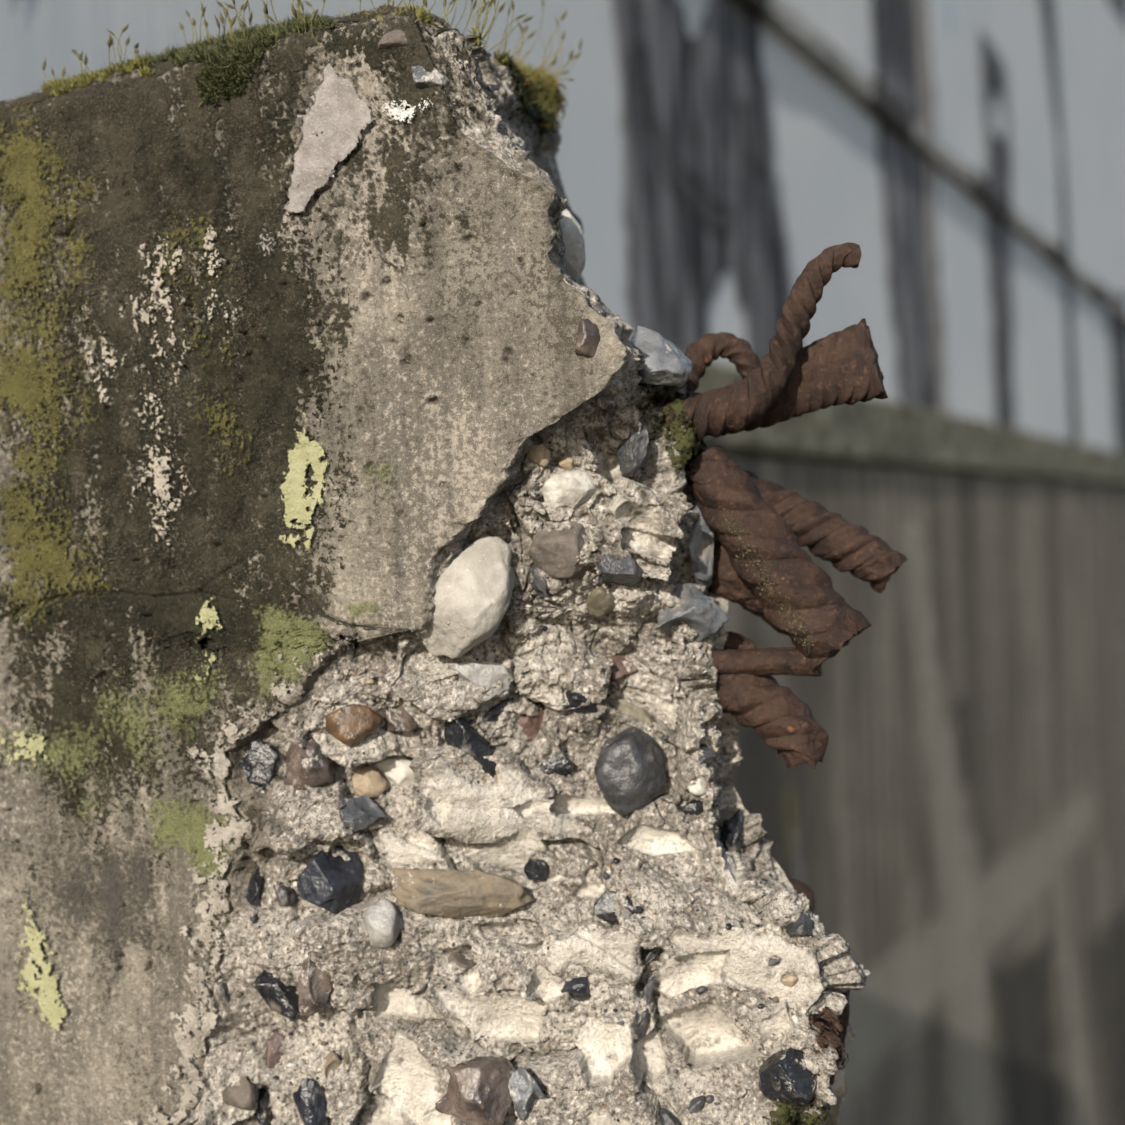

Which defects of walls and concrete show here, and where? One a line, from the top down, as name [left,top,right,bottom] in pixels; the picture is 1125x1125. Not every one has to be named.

leakage [0,5,490,1001]
crack [284,583,425,658]
spalling [117,14,870,1125]
rust [664,242,908,769]